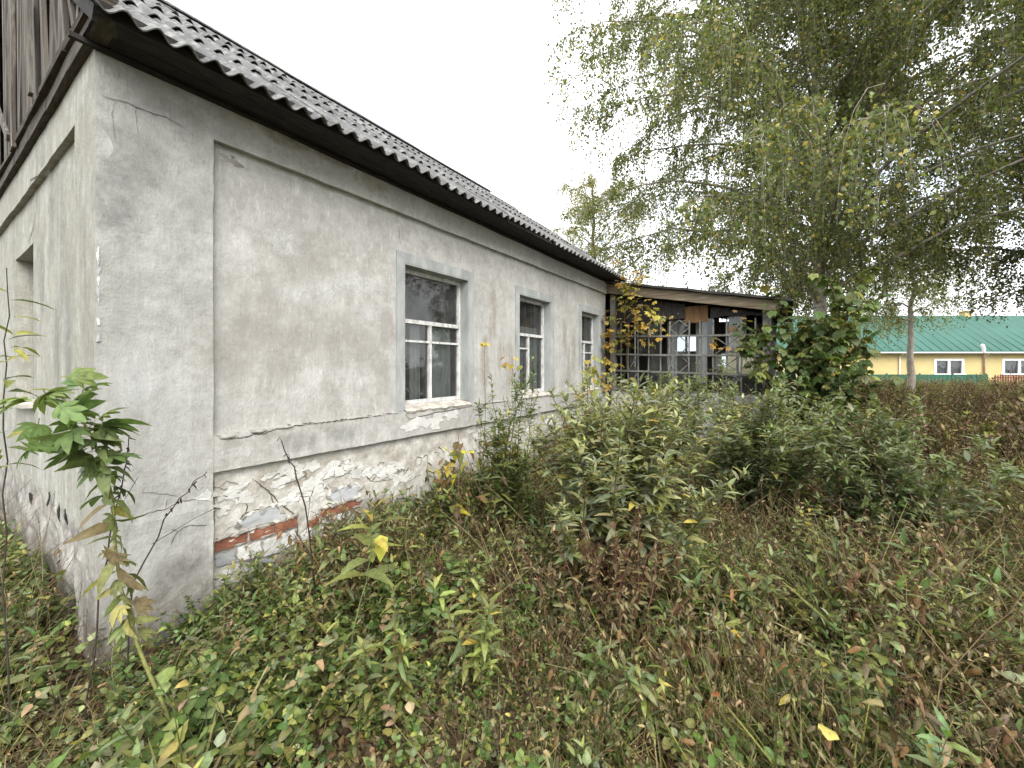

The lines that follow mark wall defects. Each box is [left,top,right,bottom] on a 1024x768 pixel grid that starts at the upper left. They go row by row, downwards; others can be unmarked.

crack [100,93,183,136]
peeling [401,410,460,432]
peeling [194,458,414,573]